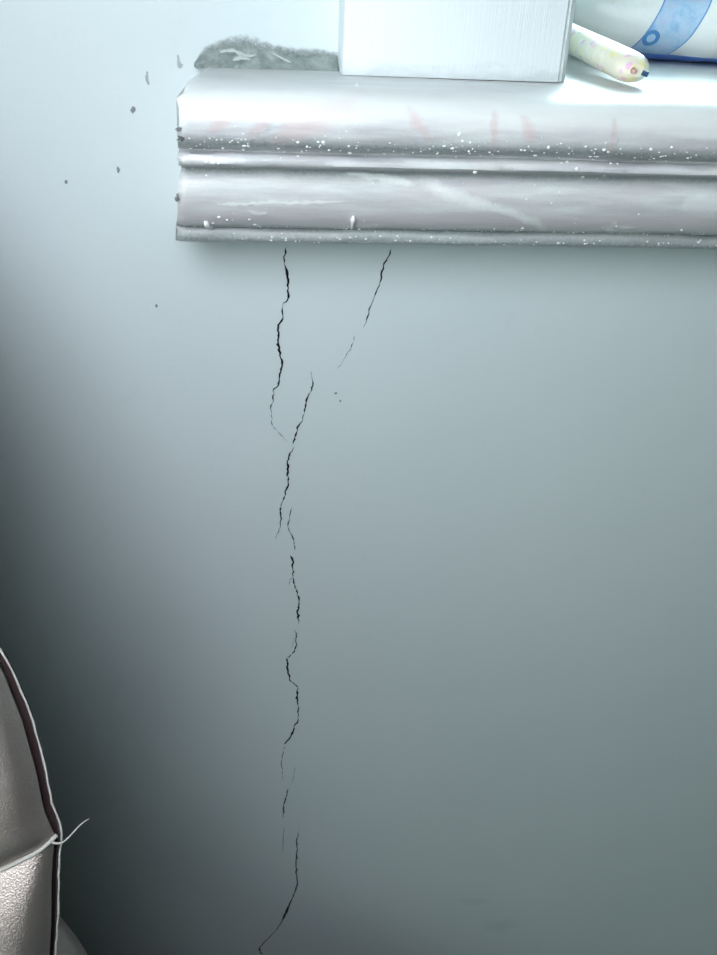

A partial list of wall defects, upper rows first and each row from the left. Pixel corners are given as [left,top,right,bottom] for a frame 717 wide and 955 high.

crack [259,248,314,954]
crack [338,250,391,368]